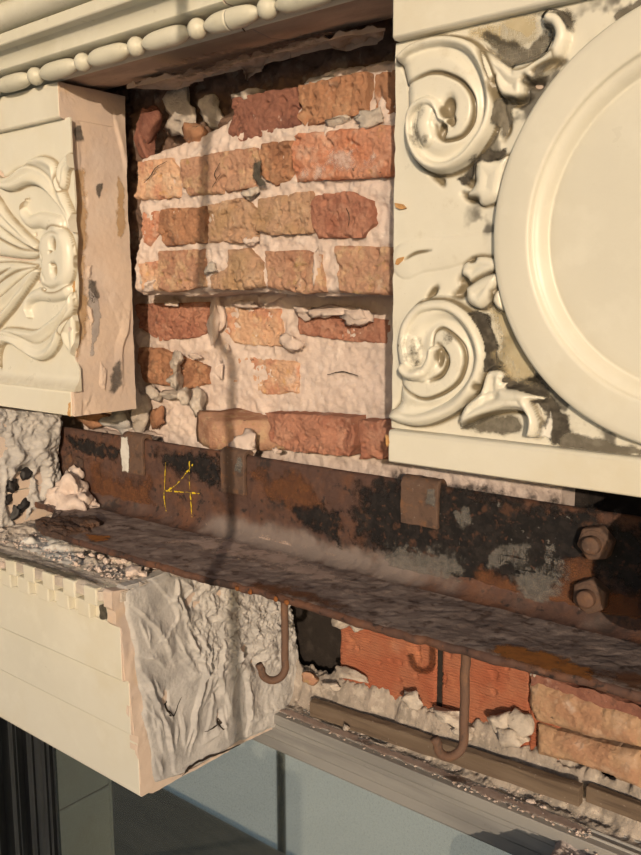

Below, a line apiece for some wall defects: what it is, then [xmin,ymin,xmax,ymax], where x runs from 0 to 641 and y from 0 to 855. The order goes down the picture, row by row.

water stain [473,17,537,46]
spalling [127,25,385,90]
spalling [133,105,162,159]
water stain [493,308,535,381]
spalling [67,402,112,429]
spalling [150,405,165,429]
water stain [540,415,552,438]
spalling [595,492,641,516]
corrosion [235,583,338,608]
corrosion [544,557,596,607]
spalling [290,606,341,674]
corrosion [494,644,641,689]